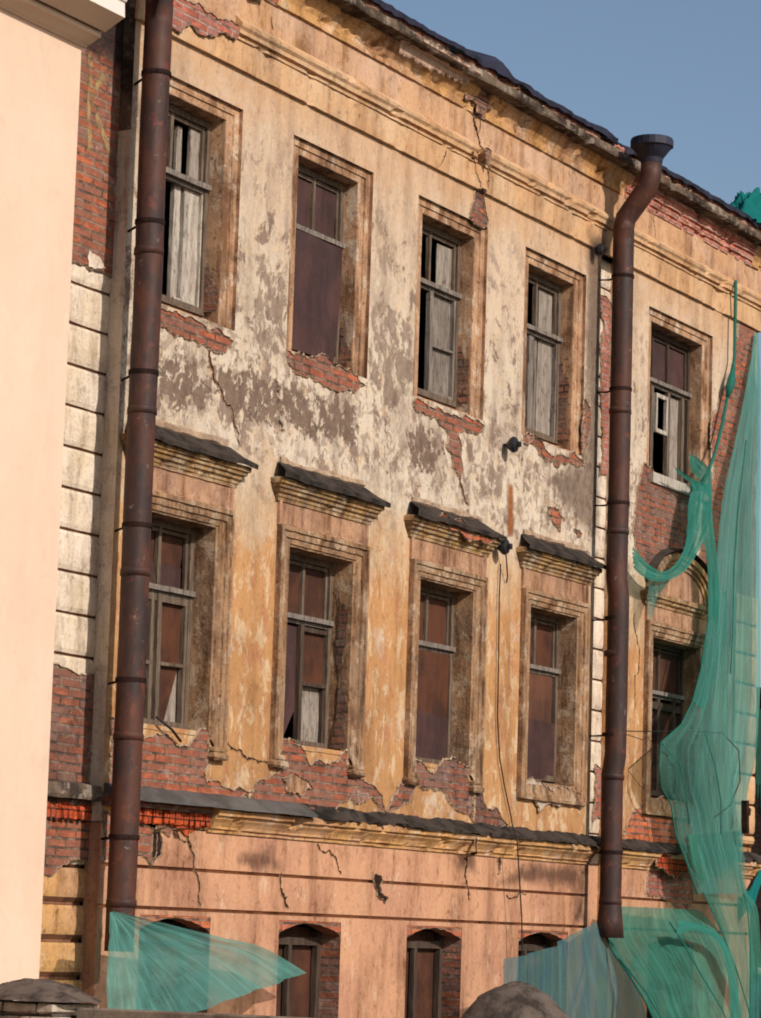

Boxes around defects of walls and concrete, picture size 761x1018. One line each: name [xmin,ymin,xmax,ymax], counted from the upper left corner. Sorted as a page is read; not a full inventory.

flaking render [72,45,121,278]
crack [471,85,523,188]
crack [208,351,240,444]
peeling [158,256,485,478]
flaking render [699,322,755,565]
flaking render [632,462,690,564]
flaking render [48,662,96,784]
flaking render [141,727,508,827]
flaking render [44,797,110,877]
crack [156,827,201,906]
crack [279,872,289,909]
crack [317,844,341,874]